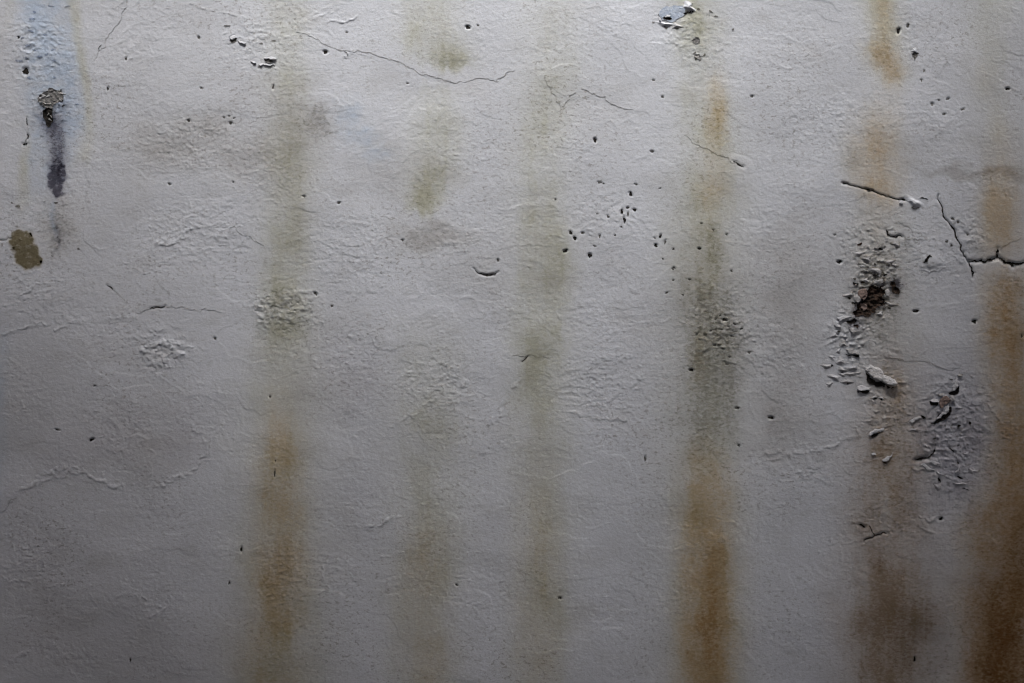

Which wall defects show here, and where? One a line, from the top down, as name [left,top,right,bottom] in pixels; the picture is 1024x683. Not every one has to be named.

spalling [16,11,61,80]
peeling [652,0,718,29]
spalling [37,76,79,127]
water stain [42,111,65,197]
peeling [9,230,53,268]
crack [843,182,1024,278]
spalling [820,241,900,400]
peeling [906,374,971,432]